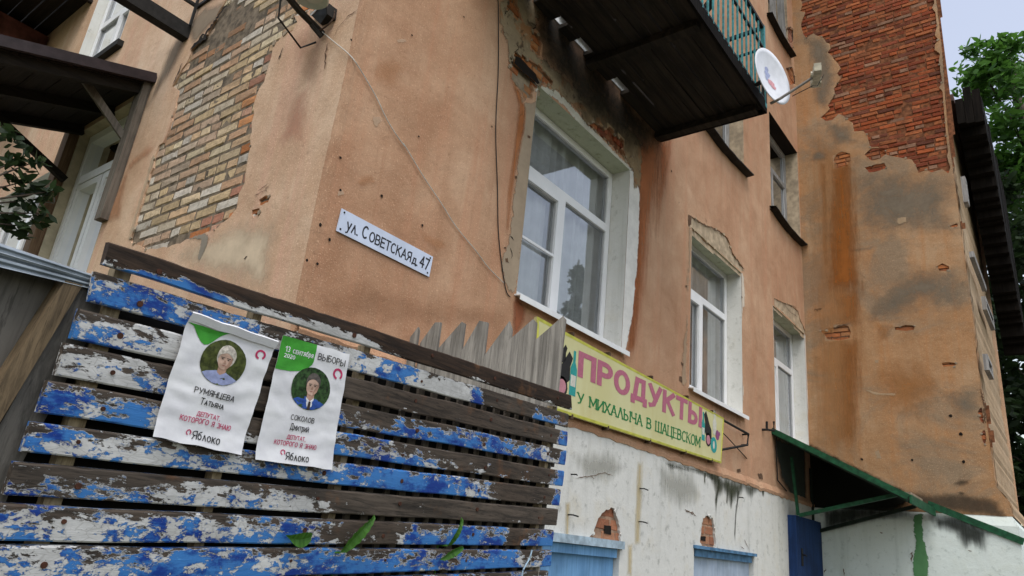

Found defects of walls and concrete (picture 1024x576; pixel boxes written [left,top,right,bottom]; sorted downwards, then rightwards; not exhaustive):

flaking render [129,0,313,251]
peeling [500,0,642,293]
corrosion [832,165,857,321]
flaking render [788,0,956,173]
damp [868,180,941,223]
flaking render [578,508,622,549]
flaking render [699,514,716,559]
damp [668,463,764,526]